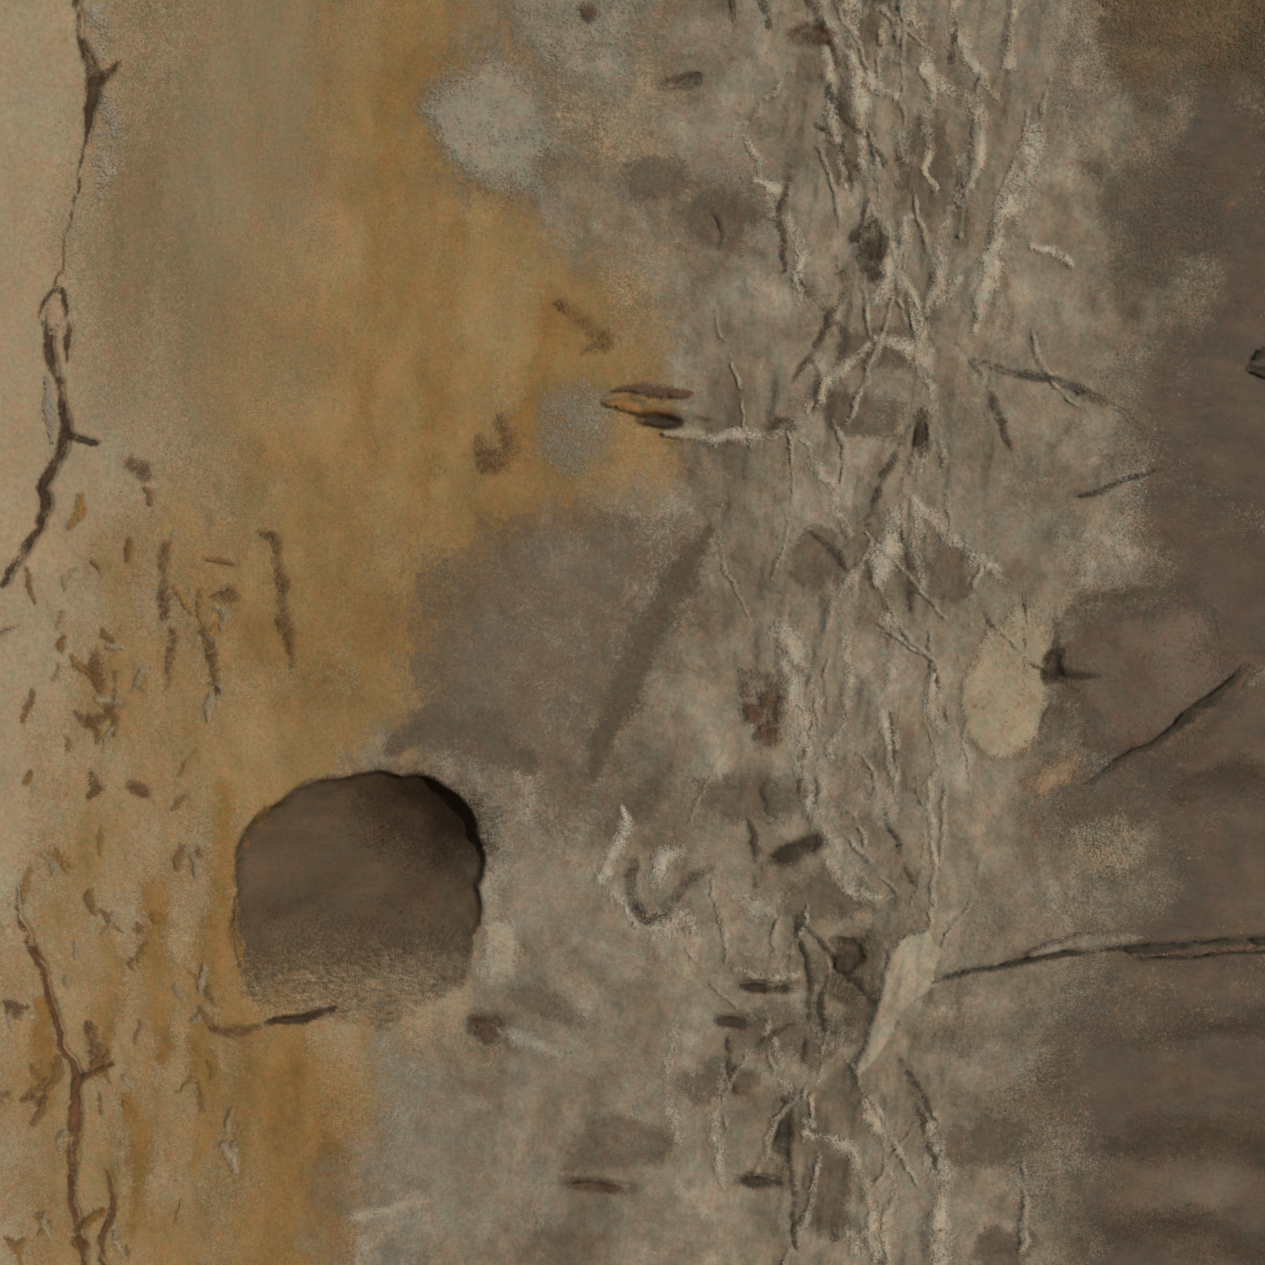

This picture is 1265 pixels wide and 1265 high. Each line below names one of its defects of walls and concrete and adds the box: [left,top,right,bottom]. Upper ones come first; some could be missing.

crack [0,0,120,587]
crack [14,885,117,1265]
water stain [16,0,520,710]
spalling [284,0,1265,1265]
water stain [295,0,1265,1265]
crack [932,929,1265,985]
crack [1089,662,1251,785]